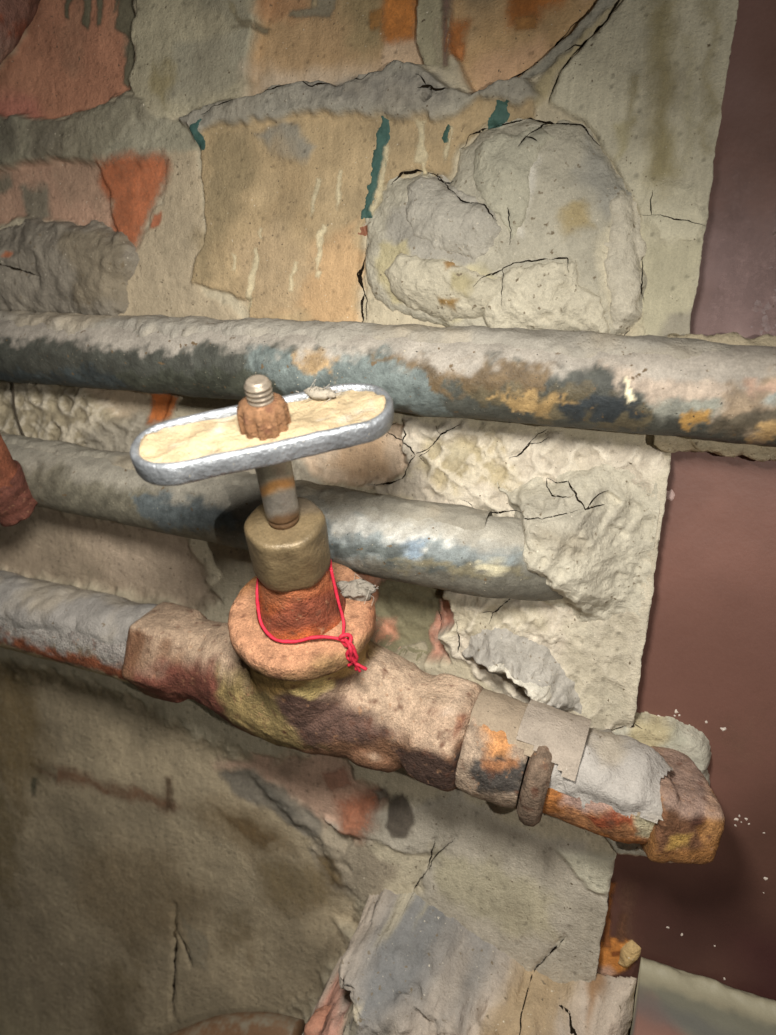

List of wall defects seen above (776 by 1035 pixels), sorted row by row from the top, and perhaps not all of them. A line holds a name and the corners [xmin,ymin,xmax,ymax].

flaking render [370,0,416,41]
peeling [190,119,205,151]
peeling [488,100,512,129]
peeling [358,116,390,237]
flaking render [100,155,168,244]
crack [370,421,460,486]
crack [513,431,547,457]
crack [464,478,608,520]
corrosion [597,882,628,976]
crack [519,936,566,1035]
crack [559,1005,577,1035]